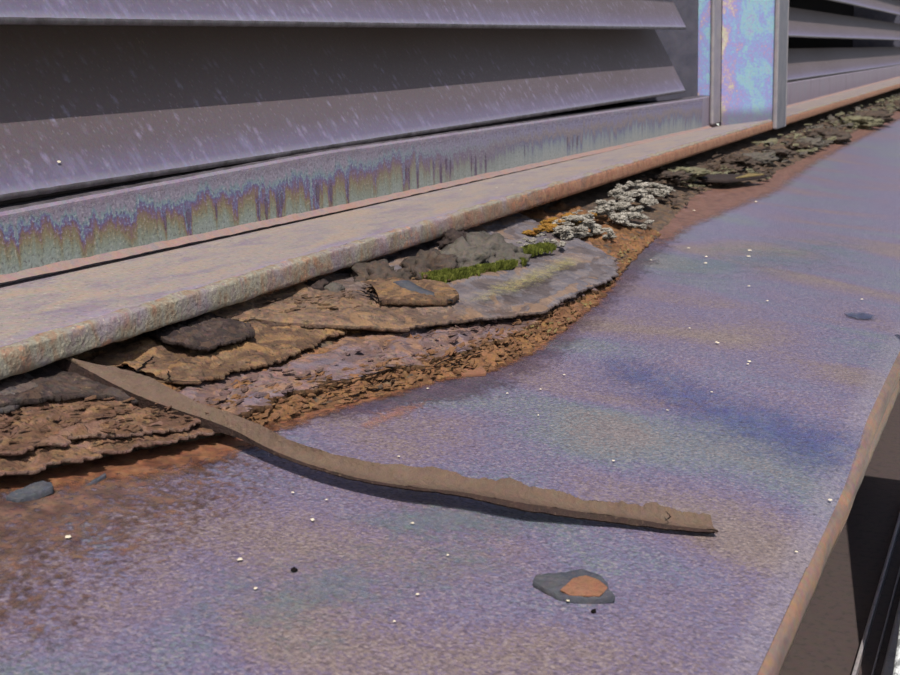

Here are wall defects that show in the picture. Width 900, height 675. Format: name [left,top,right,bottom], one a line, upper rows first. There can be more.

damp [0,101,703,275]
rust [71,84,900,433]
rust [0,363,259,638]
peeling [52,357,718,534]
rust [533,569,615,604]